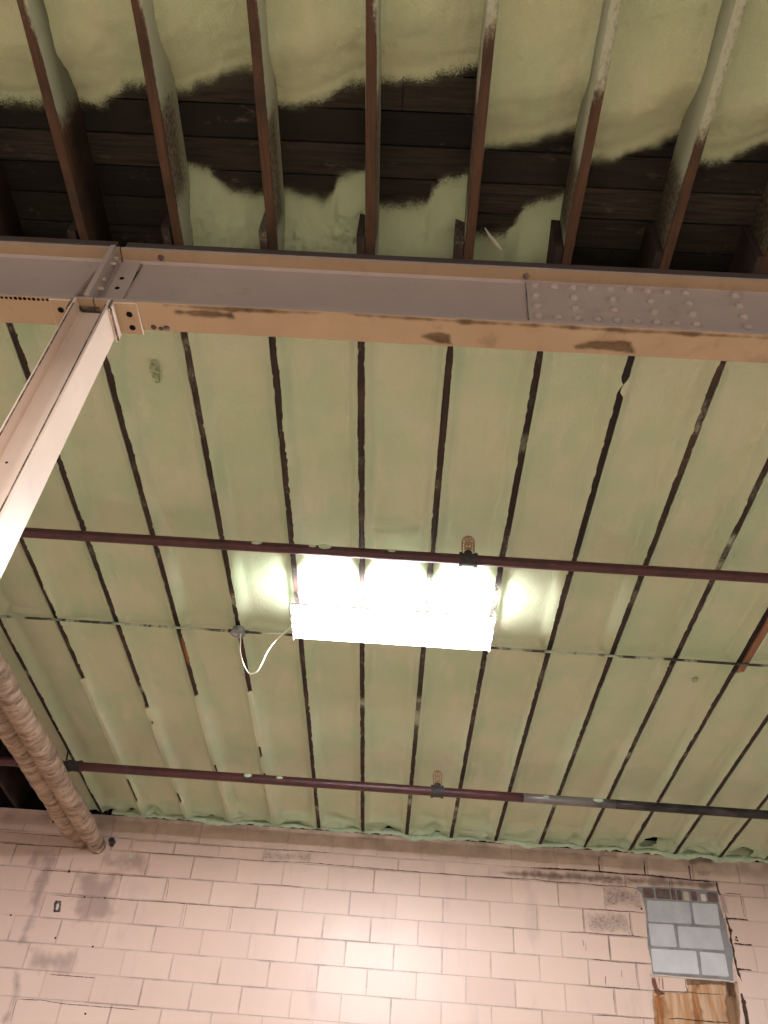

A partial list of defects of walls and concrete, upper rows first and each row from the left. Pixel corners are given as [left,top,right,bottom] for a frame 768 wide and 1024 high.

leakage [522,872,713,903]